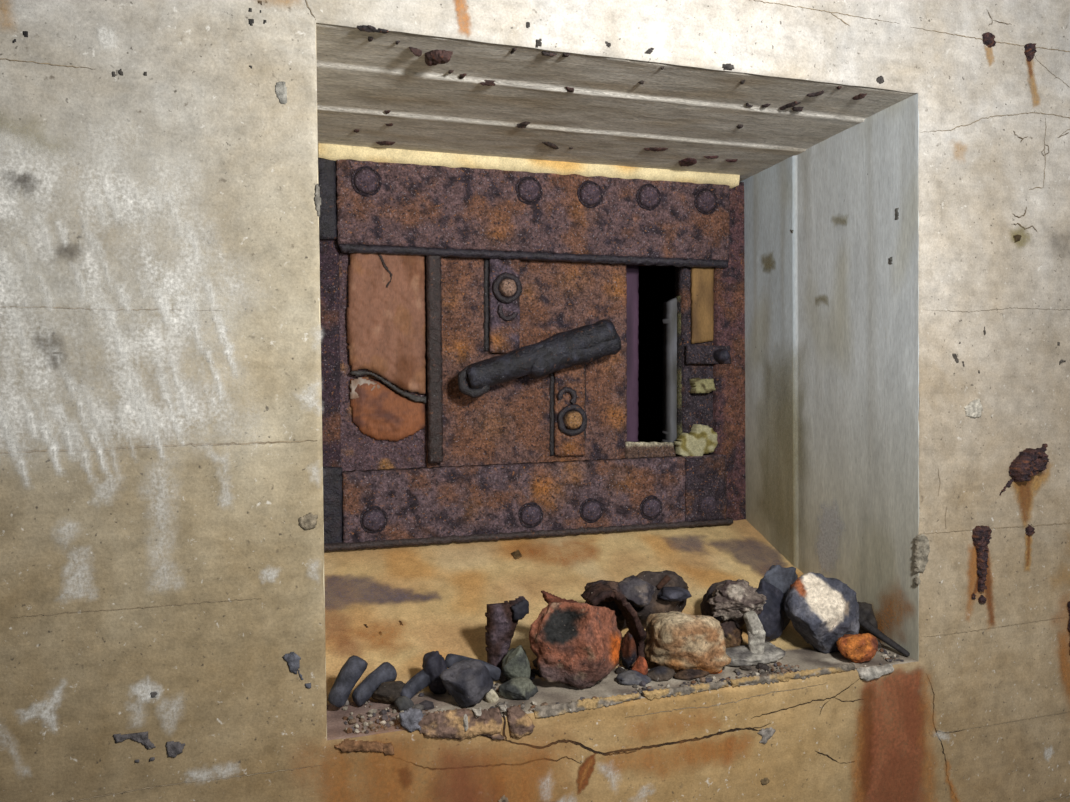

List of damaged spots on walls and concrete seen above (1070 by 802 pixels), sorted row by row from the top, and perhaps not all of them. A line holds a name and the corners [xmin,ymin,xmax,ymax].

corrosion [455,0,469,34]
corrosion [1024,43,1039,104]
crack [937,112,1070,189]
corrosion [350,377,426,442]
corrosion [999,444,1050,570]
corrosion [970,525,993,623]
corrosion [1062,601,1070,685]
corrosion [577,754,595,794]
crack [340,679,862,770]
corrosion [855,670,931,802]
crack [927,676,1067,798]